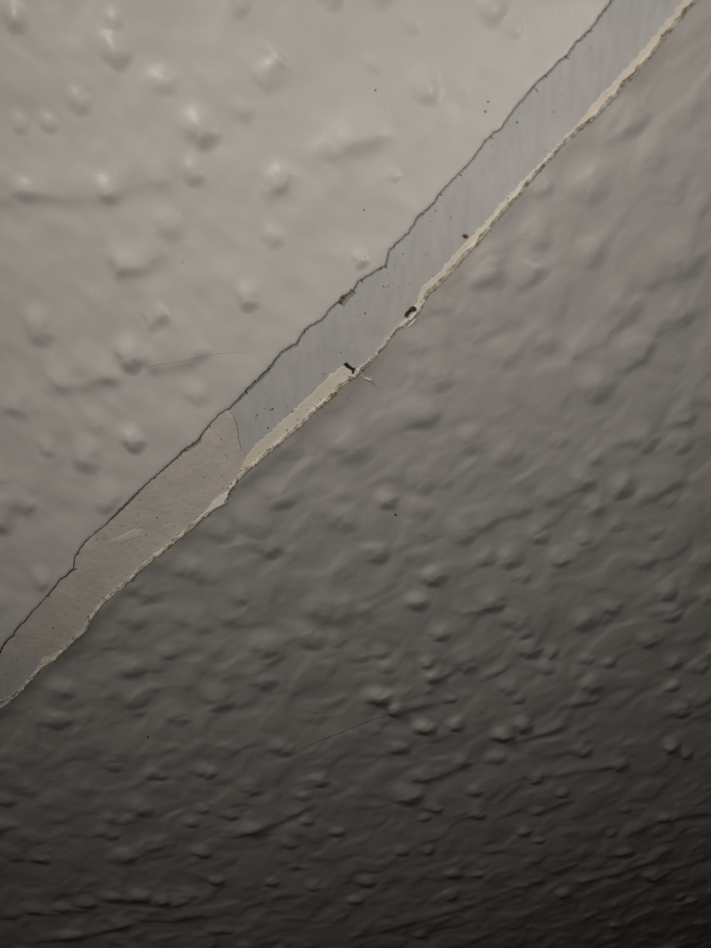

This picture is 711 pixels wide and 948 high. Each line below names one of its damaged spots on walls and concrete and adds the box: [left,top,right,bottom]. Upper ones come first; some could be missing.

crack [0,0,612,653]
peeling [0,0,699,709]